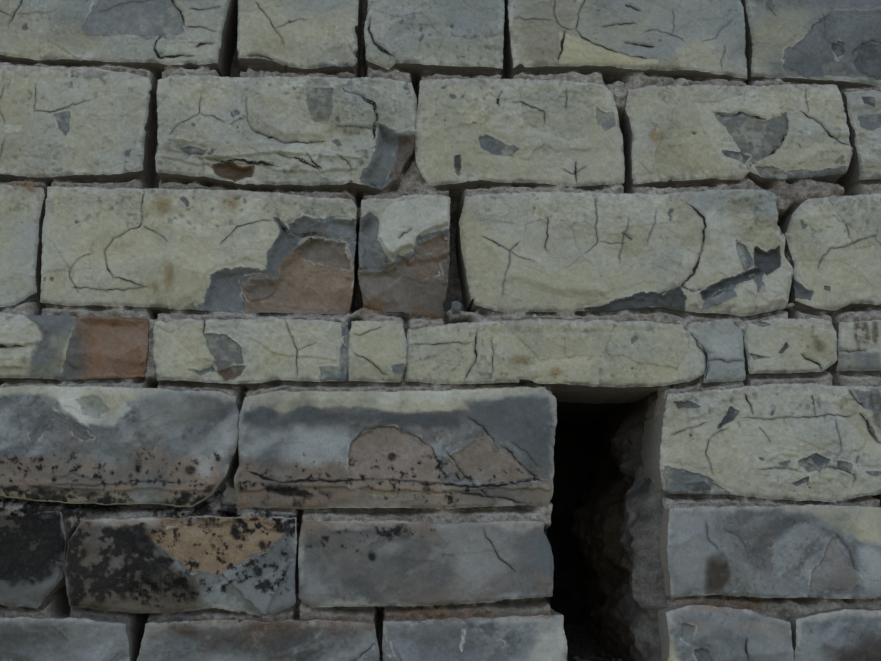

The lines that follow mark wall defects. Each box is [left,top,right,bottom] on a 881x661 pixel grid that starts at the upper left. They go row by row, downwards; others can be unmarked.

crack [154,0,220,59]
crack [206,89,378,173]
spalling [188,195,462,381]
crack [482,218,549,290]
crack [594,203,656,265]
crack [648,202,707,298]
spalling [62,316,148,381]
spalling [347,424,536,496]
crack [673,391,880,476]